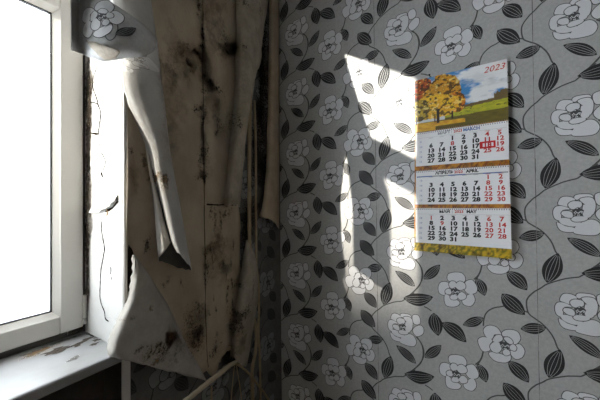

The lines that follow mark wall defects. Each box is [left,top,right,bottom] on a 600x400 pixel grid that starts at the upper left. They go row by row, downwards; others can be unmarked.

damp [251,7,269,188]
peeling [89,194,118,216]
damp [240,196,255,256]
crack [99,221,112,322]
spalling [41,337,100,356]